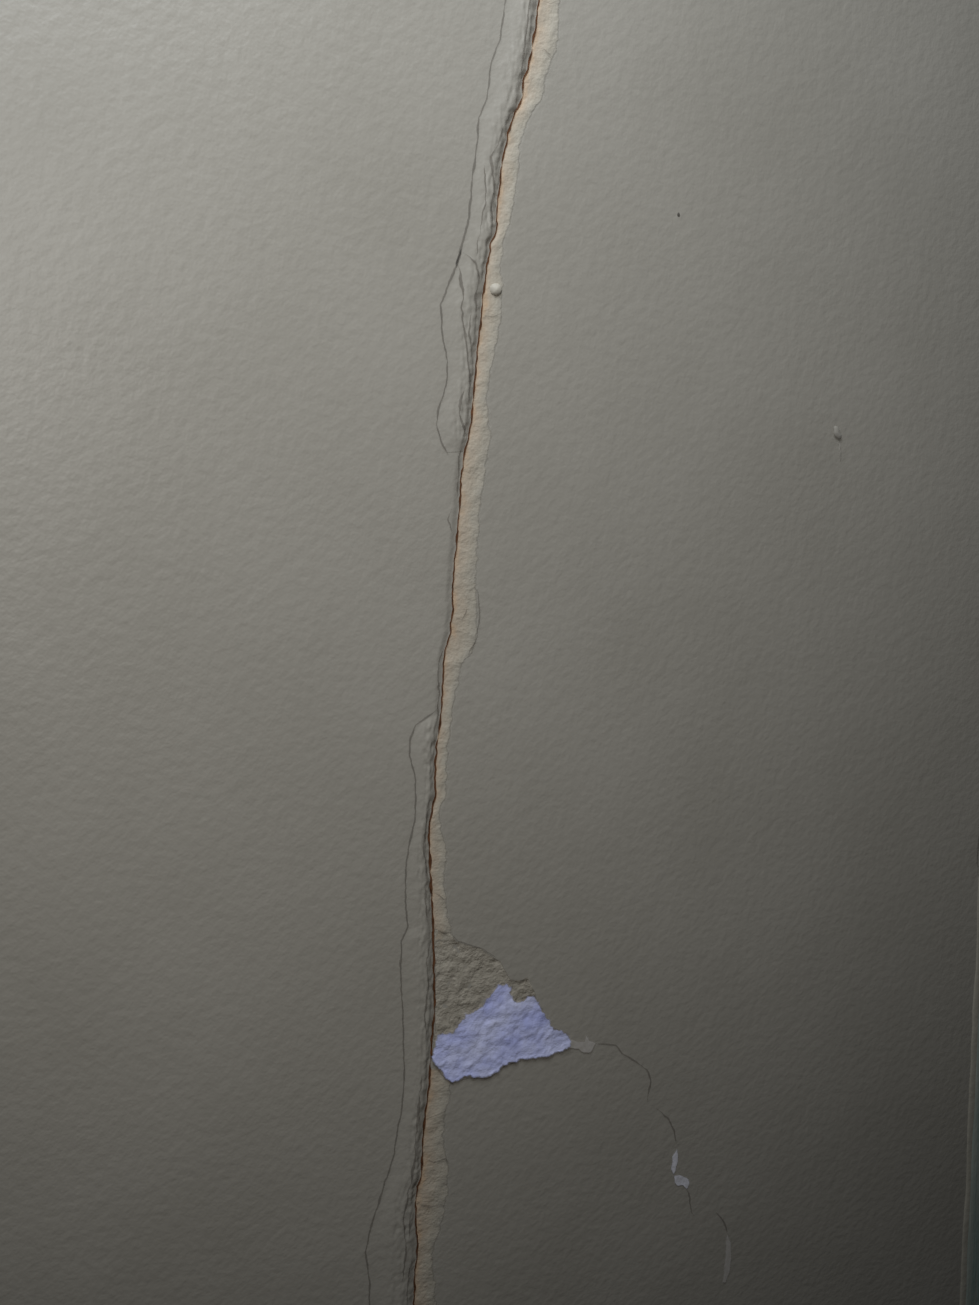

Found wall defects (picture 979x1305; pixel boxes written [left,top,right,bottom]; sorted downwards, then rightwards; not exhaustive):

crack [413,0,560,1305]
peeling [432,929,596,1082]